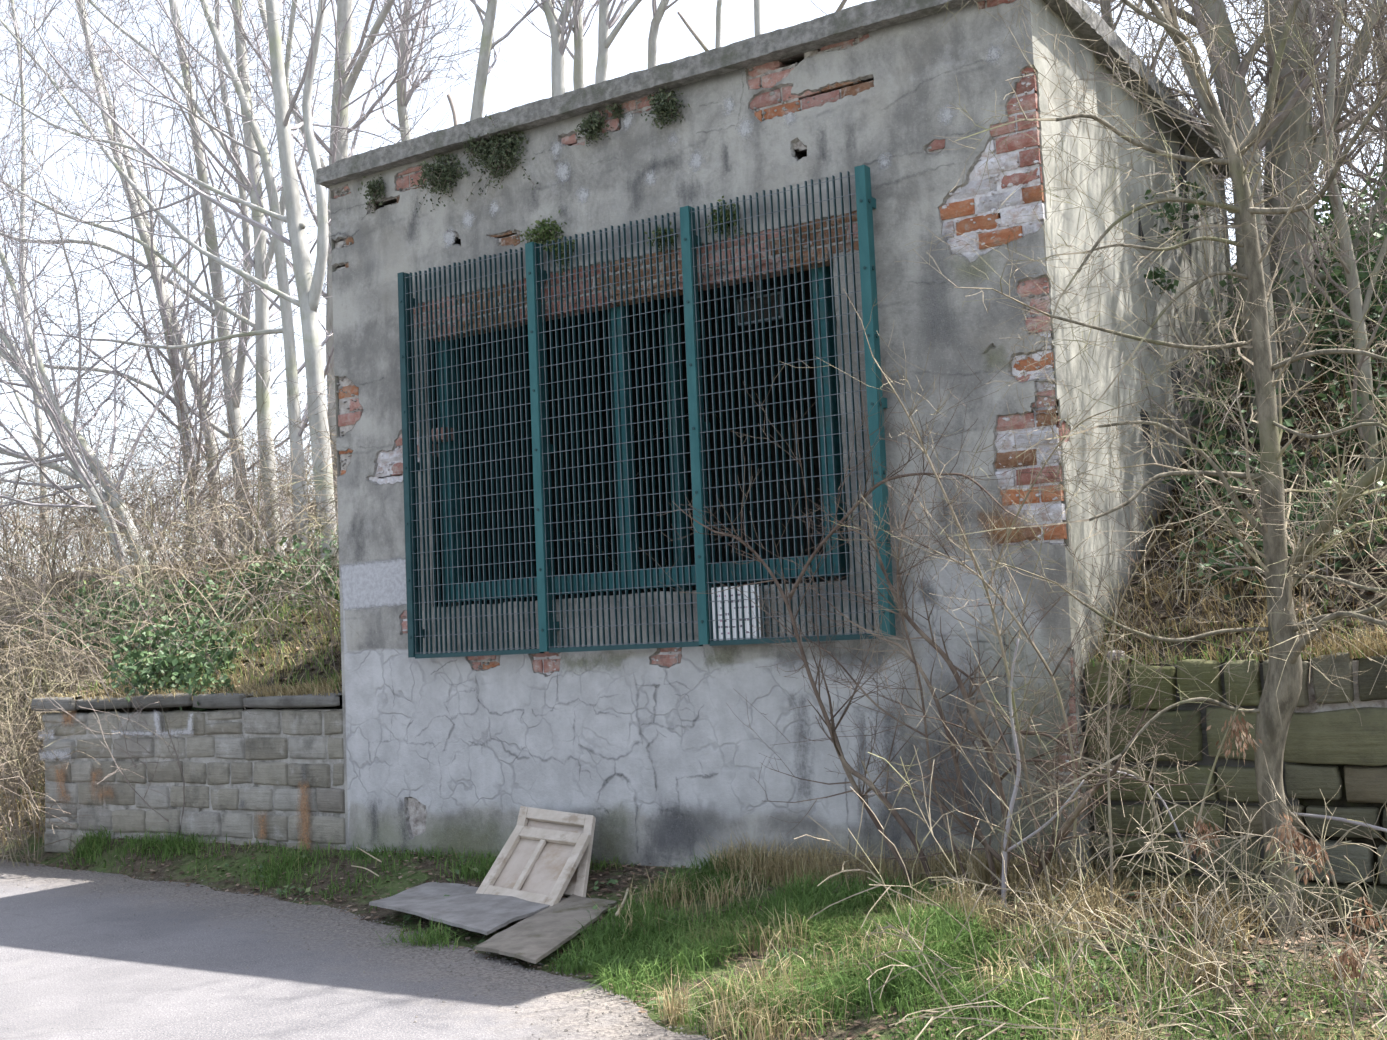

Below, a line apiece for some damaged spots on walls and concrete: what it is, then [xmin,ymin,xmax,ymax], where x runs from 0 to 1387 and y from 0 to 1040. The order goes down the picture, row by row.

spalling [745,33,874,123]
spalling [790,137,807,161]
spalling [938,64,1046,263]
spalling [335,376,364,476]
spalling [992,274,1070,547]
spalling [366,427,454,485]
spalling [465,655,500,671]
spalling [528,651,562,677]
spalling [649,647,682,668]
spalling [404,797,427,840]